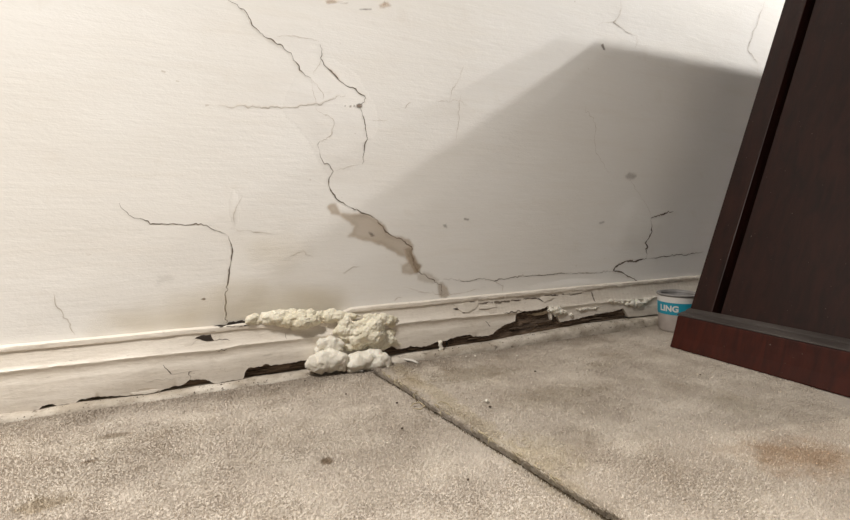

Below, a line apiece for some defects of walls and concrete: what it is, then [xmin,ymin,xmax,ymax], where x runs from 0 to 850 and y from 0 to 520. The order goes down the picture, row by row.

crack [120,199,270,323]
crack [222,1,695,314]